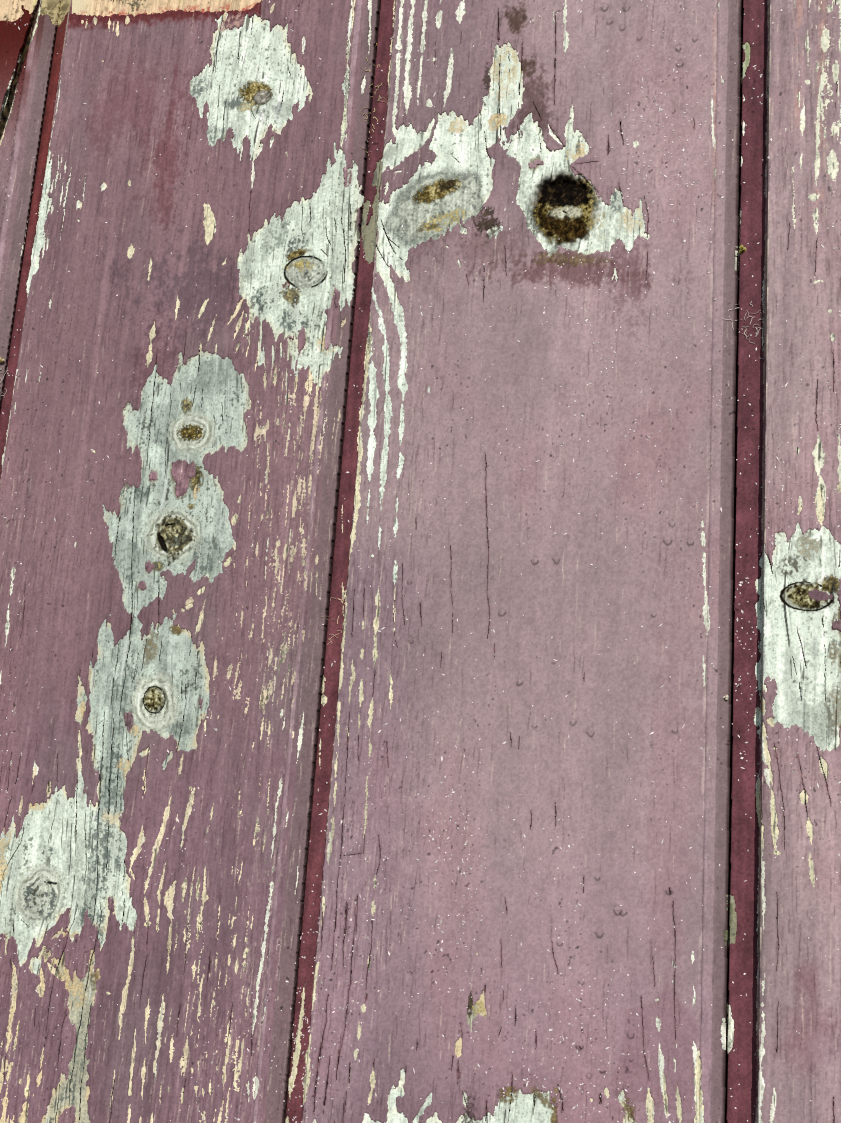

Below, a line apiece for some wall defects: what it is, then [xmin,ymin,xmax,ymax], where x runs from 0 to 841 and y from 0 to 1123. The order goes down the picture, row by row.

peeling [791,0,841,234]
peeling [0,0,650,1123]
peeling [590,1017,704,1123]
peeling [754,434,841,1123]